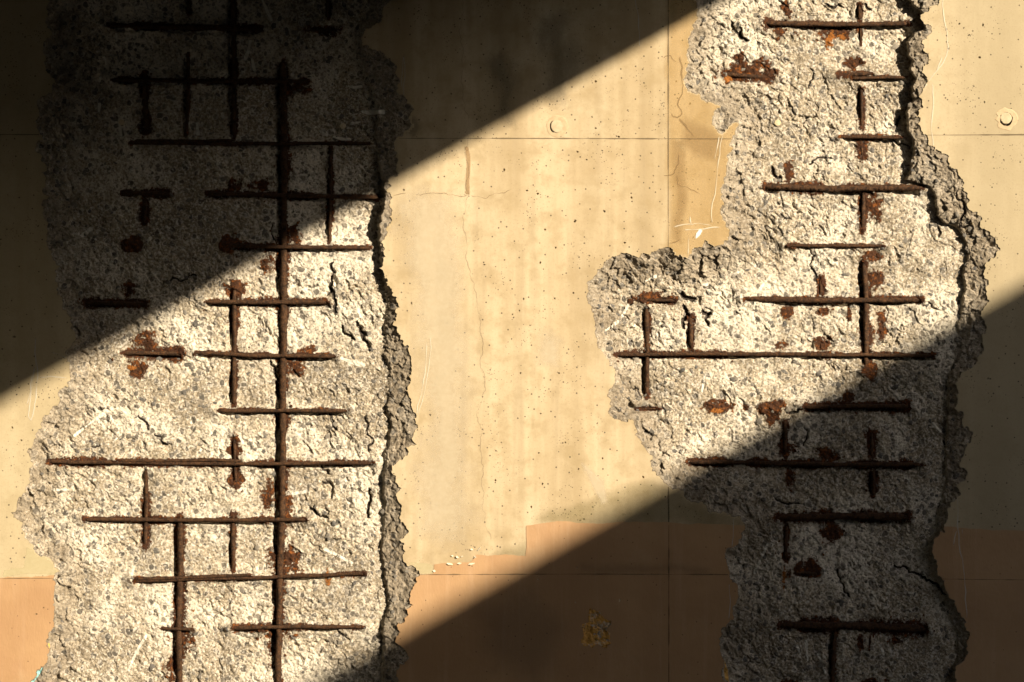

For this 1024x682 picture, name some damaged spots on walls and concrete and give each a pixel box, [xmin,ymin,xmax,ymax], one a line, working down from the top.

rust [771,0,875,51]
rust [714,51,791,89]
rust [843,55,866,76]
rust [222,276,248,305]
rust [857,249,888,292]
rust [127,330,162,381]
spalling [11,0,420,682]
spalling [586,0,1000,682]
rust [873,306,889,342]
rust [700,398,791,428]
rust [226,434,245,492]
rust [260,477,305,579]